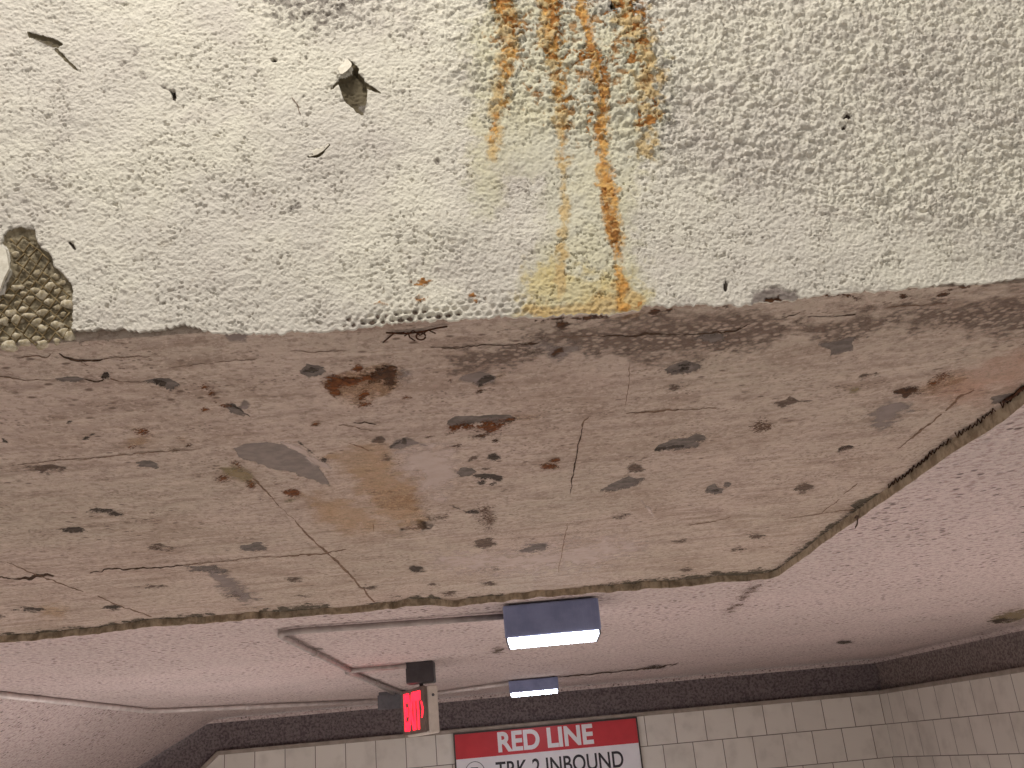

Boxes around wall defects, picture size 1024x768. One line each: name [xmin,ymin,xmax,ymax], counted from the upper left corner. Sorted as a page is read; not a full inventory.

spalling [27,32,78,71]
spalling [330,59,381,115]
corrosion [471,0,666,330]
flaking render [0,227,82,352]
corrosion [320,364,409,408]
corrosion [426,414,516,448]
crack [570,417,589,493]